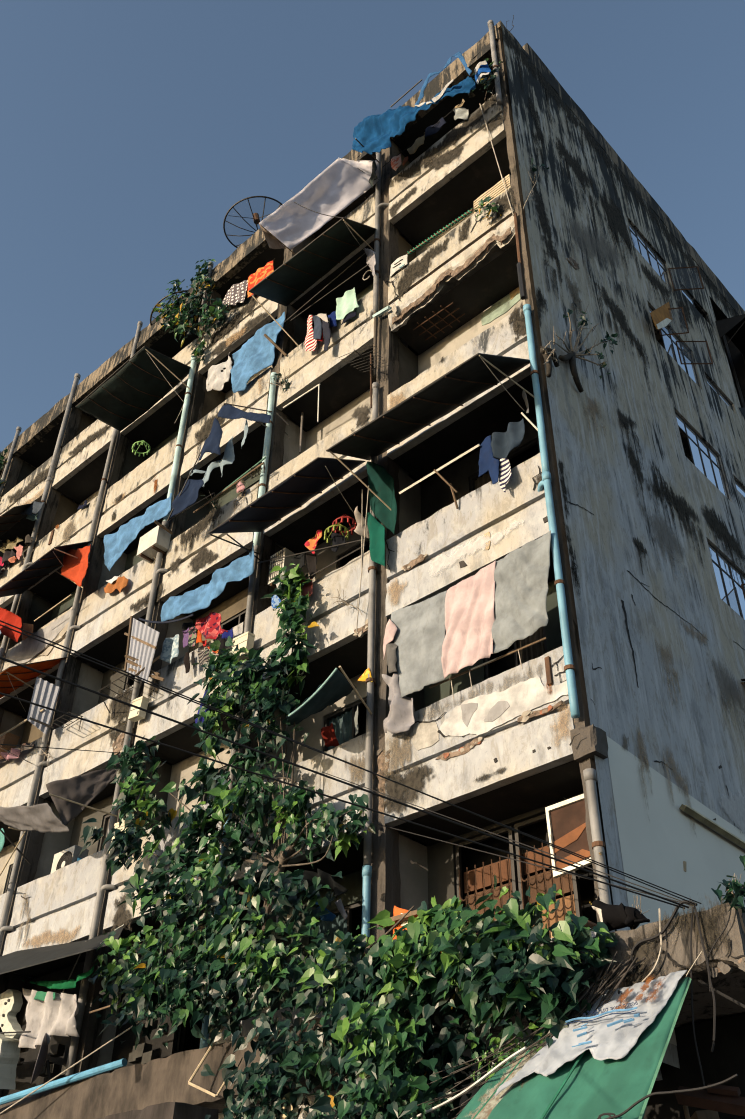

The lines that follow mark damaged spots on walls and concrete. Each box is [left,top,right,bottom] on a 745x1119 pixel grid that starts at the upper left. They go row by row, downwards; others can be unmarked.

damp [502,26,739,374]
damp [130,476,247,611]
damp [558,460,580,594]
damp [618,408,745,591]
damp [418,665,542,720]
peeling [413,675,568,761]
damp [714,661,744,735]
damp [380,734,434,814]
damp [623,731,652,796]
damp [17,894,80,947]
damp [111,893,132,933]
spalling [710,954,745,979]